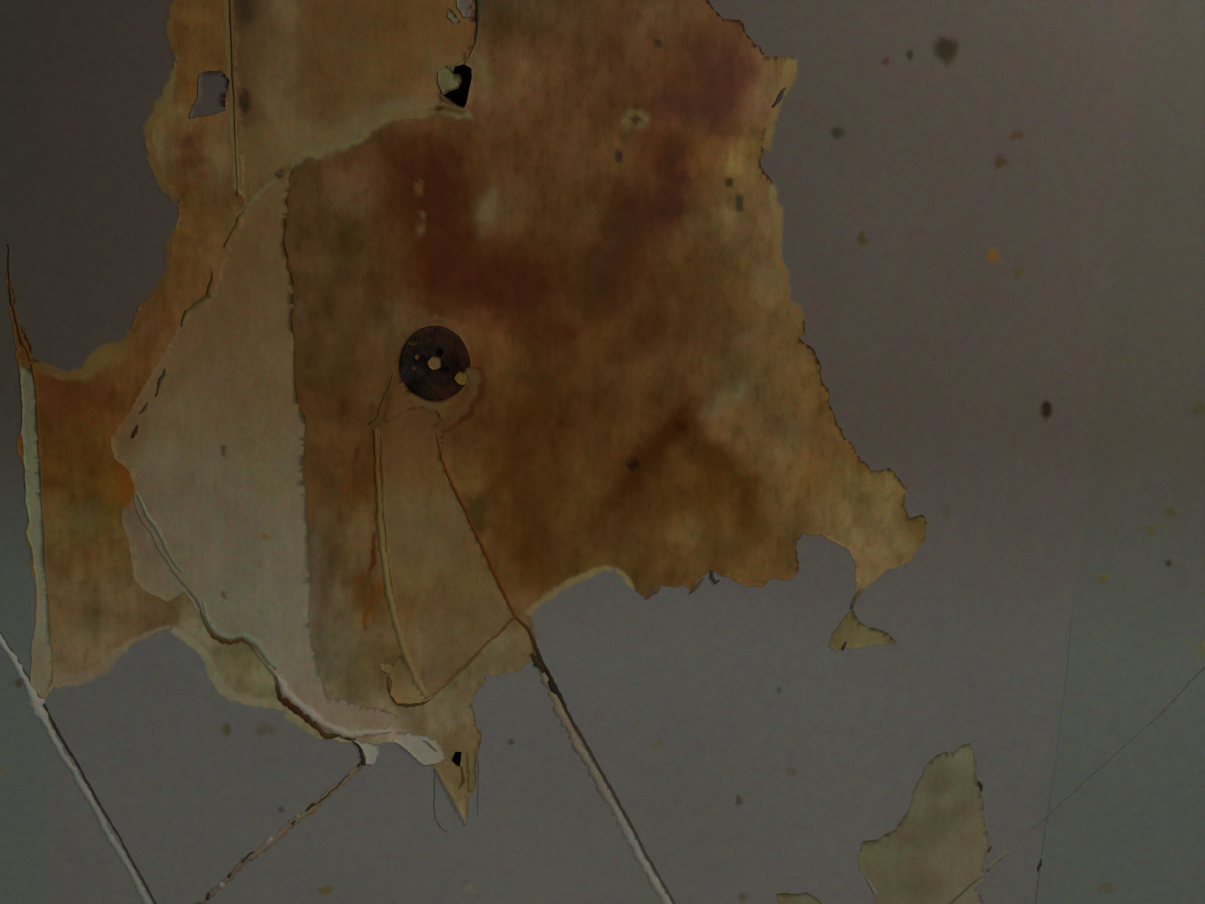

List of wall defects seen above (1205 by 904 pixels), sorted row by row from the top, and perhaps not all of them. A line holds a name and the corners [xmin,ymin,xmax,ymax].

crack [464,0,482,65]
crack [8,244,32,361]
crack [131,369,166,439]
peeling [6,0,927,825]
crack [0,631,157,904]
crack [133,492,366,904]
crack [431,433,675,904]
peeling [777,892,821,904]
peeling [857,742,992,904]